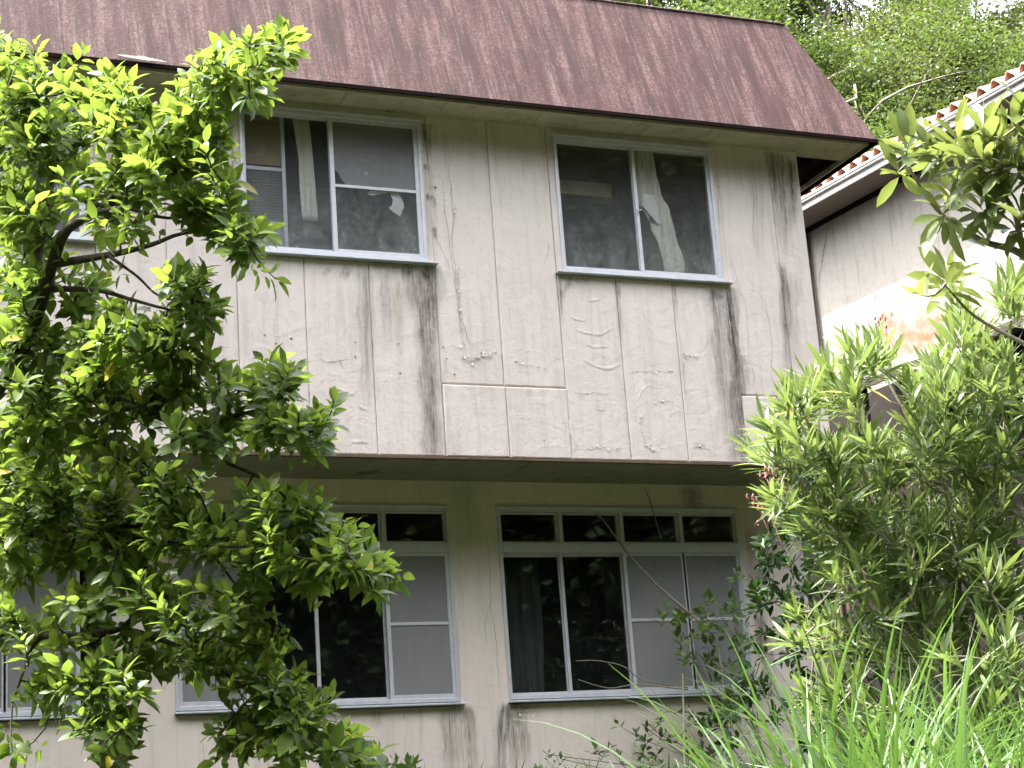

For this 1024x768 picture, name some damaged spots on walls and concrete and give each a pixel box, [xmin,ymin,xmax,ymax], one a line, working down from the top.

crack [433,134,470,350]